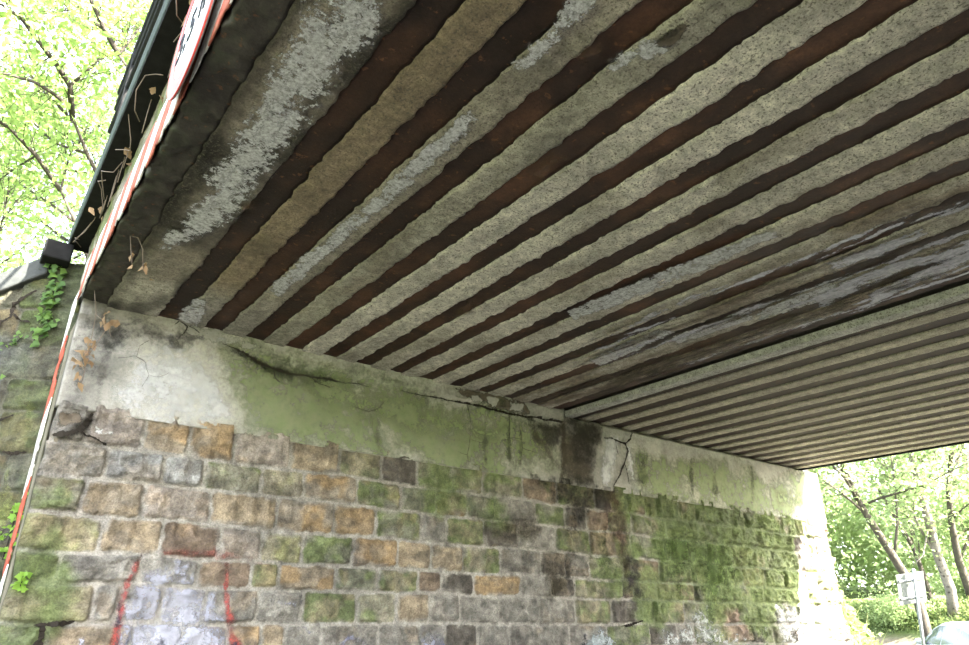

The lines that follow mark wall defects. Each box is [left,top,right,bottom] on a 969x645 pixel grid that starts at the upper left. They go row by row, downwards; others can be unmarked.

water stain [158,0,383,250]
water stain [269,110,479,296]
water stain [176,298,207,326]
water stain [563,200,969,395]
crack [52,413,107,446]
crack [222,343,564,466]
water stain [527,416,633,531]
crack [604,432,633,487]
water stain [547,551,577,598]
water stain [627,556,642,599]